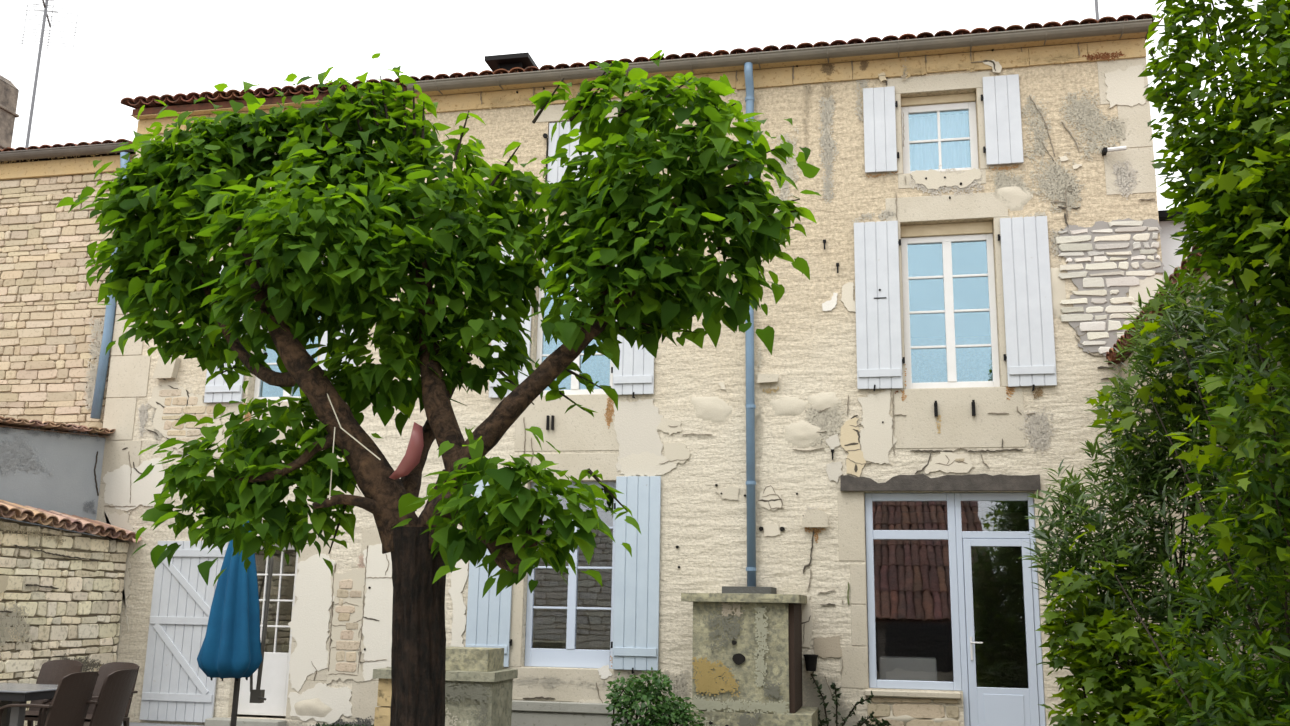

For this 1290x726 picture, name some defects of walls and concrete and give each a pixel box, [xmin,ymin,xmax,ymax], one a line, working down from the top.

water stain [909,87,1141,218]
crack [1029,95,1080,226]
flaking render [1055,218,1165,356]
peeling [826,389,897,482]
crack [793,394,1035,474]
crack [0,545,99,613]
peeling [288,544,393,724]